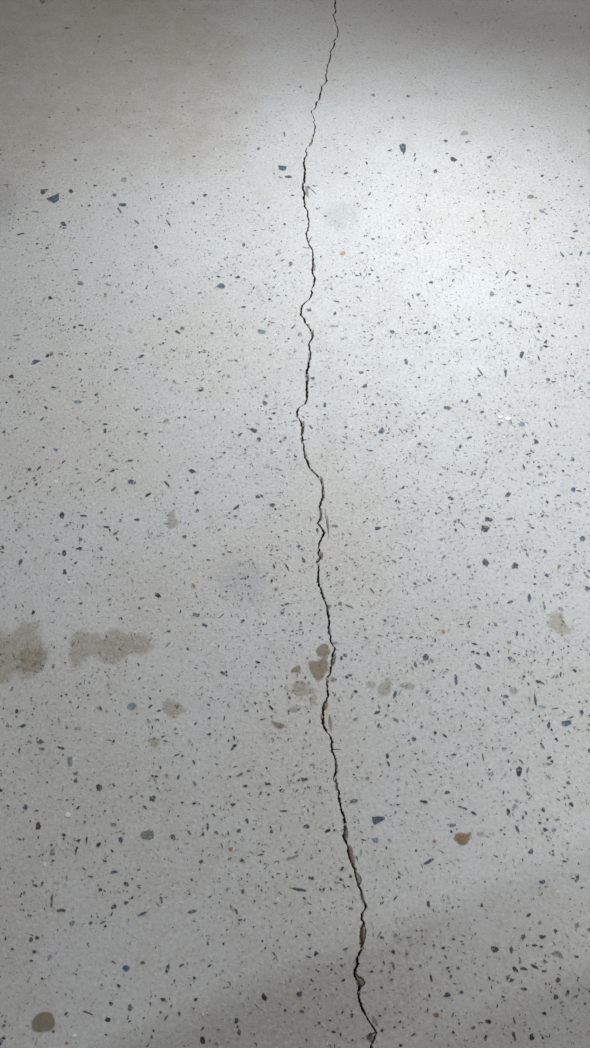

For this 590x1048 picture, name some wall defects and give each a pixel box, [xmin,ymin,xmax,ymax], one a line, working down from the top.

crack [296,0,378,1048]